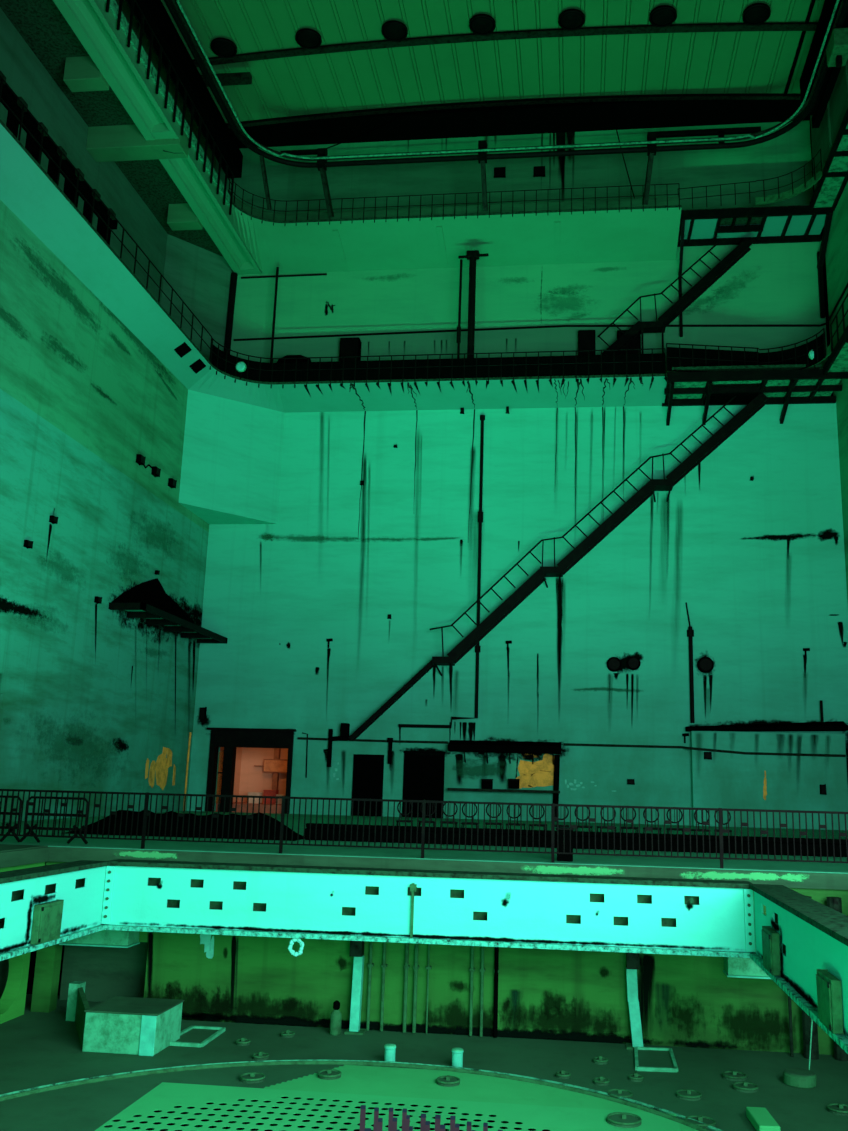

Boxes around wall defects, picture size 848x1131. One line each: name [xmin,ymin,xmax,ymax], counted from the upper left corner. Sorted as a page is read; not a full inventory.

water stain [262,458,454,570]
water stain [743,529,838,555]